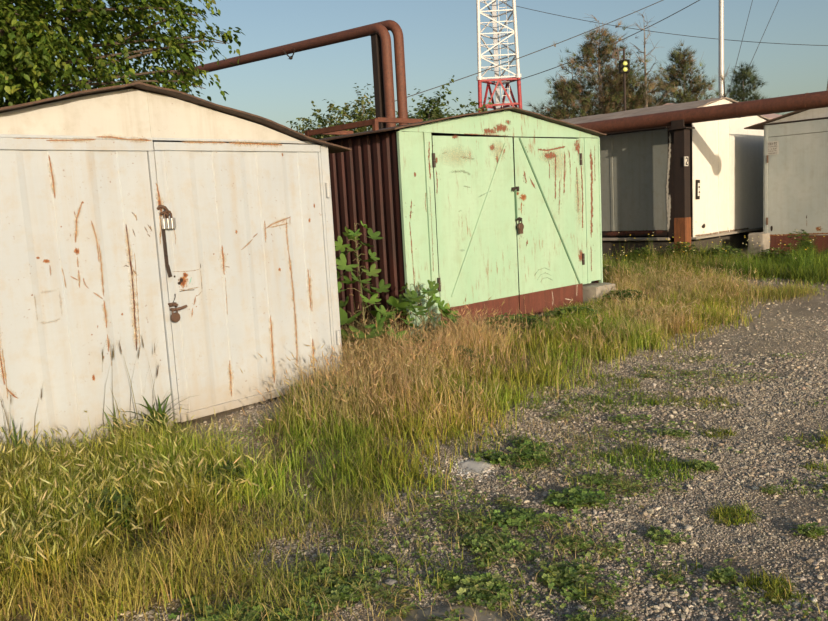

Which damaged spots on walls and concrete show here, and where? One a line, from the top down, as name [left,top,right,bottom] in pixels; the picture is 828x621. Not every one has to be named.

rust [91,221,112,365]
rust [125,225,140,351]
rust [174,270,202,312]
rust [255,216,297,344]